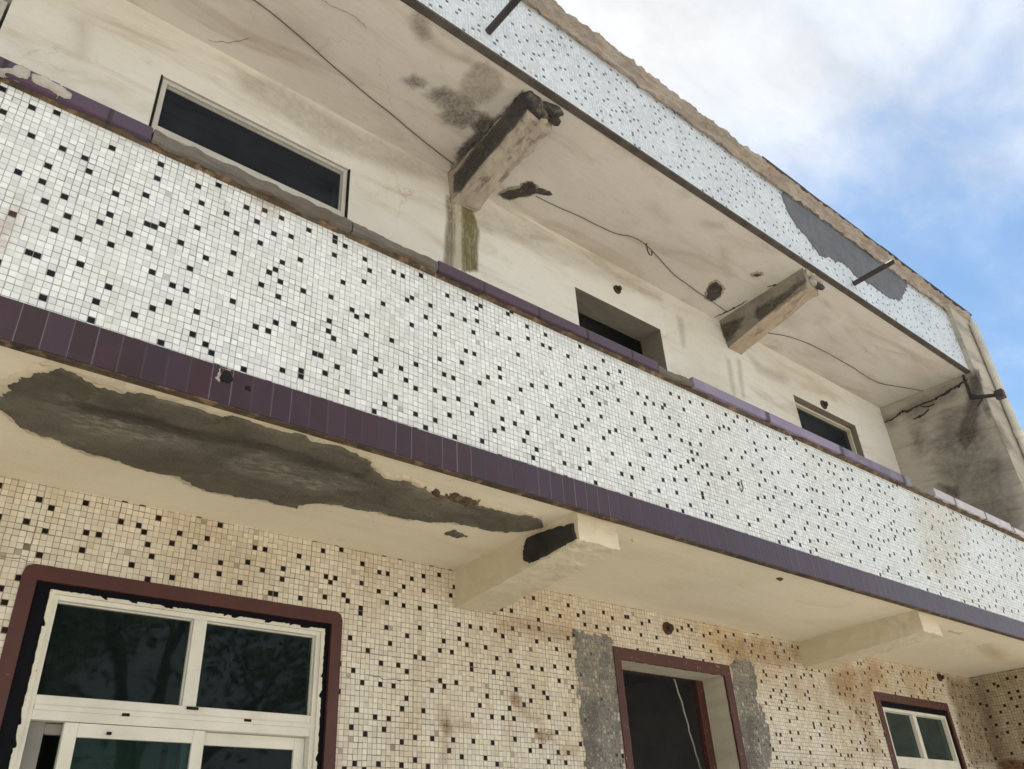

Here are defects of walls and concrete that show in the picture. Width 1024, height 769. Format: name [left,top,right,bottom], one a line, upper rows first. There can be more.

spalling [513,90,564,126]
water stain [432,90,530,271]
spalling [498,181,553,201]
spalling [704,279,726,302]
spalling [805,269,825,297]
crack [884,379,968,423]
peeling [0,360,548,532]
spalling [432,522,478,539]